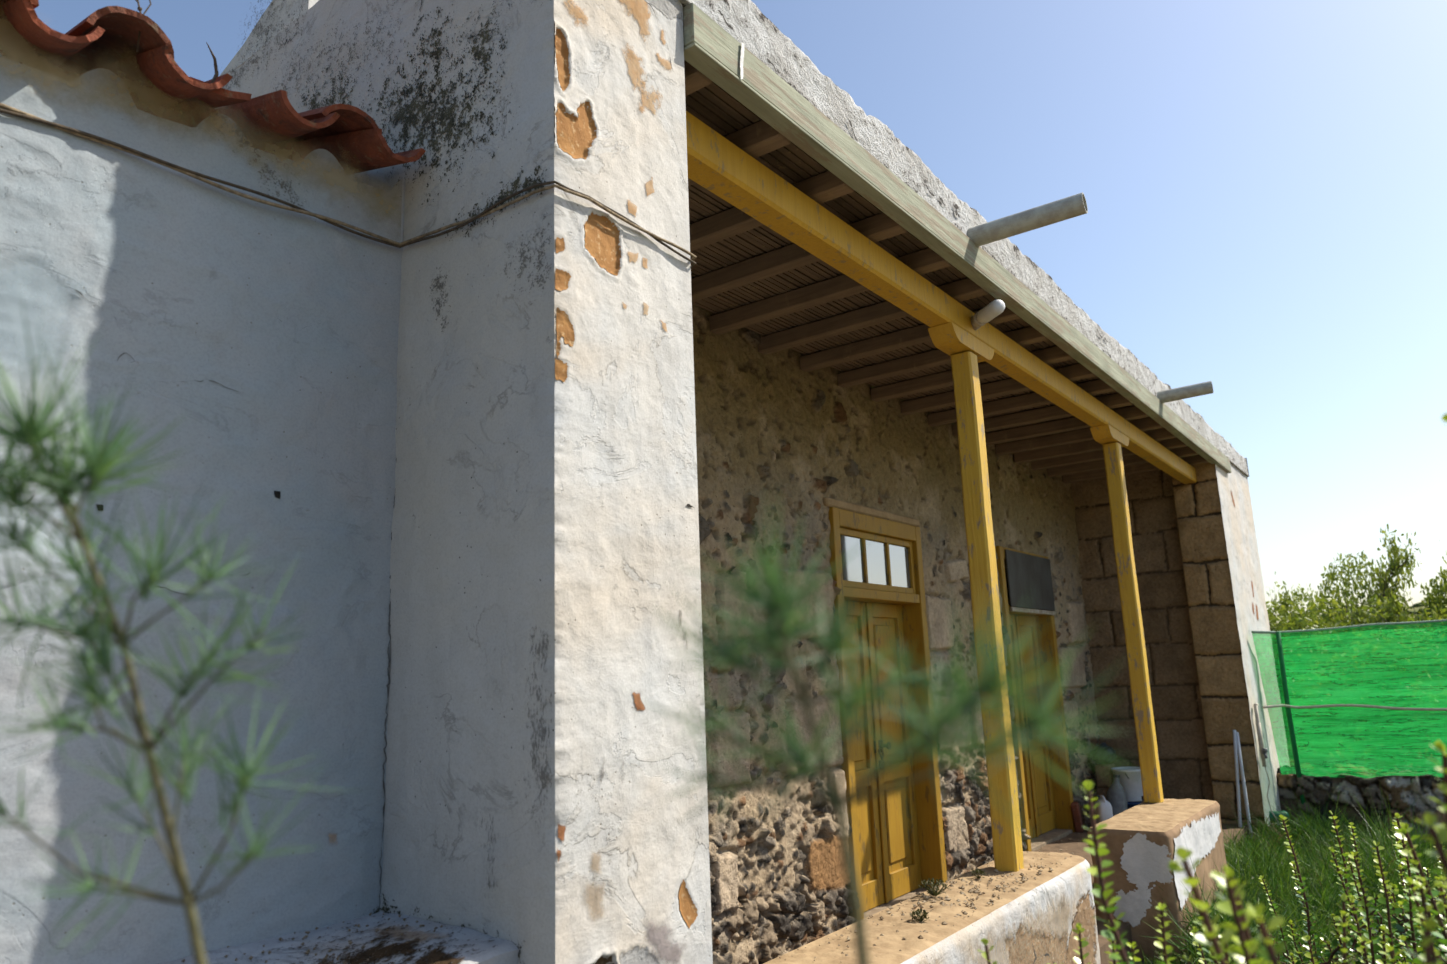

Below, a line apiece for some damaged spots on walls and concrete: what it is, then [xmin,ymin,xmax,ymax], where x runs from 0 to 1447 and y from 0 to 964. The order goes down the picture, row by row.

damp [0,18,82,87]
damp [223,0,513,205]
peeling [555,0,597,159]
peeling [619,0,682,114]
damp [443,159,550,241]
peeling [628,177,654,217]
peeling [584,212,648,276]
peeling [555,237,575,382]
peeling [1113,812,1221,928]
flaking render [595,946,660,964]
peeling [1006,890,1097,964]